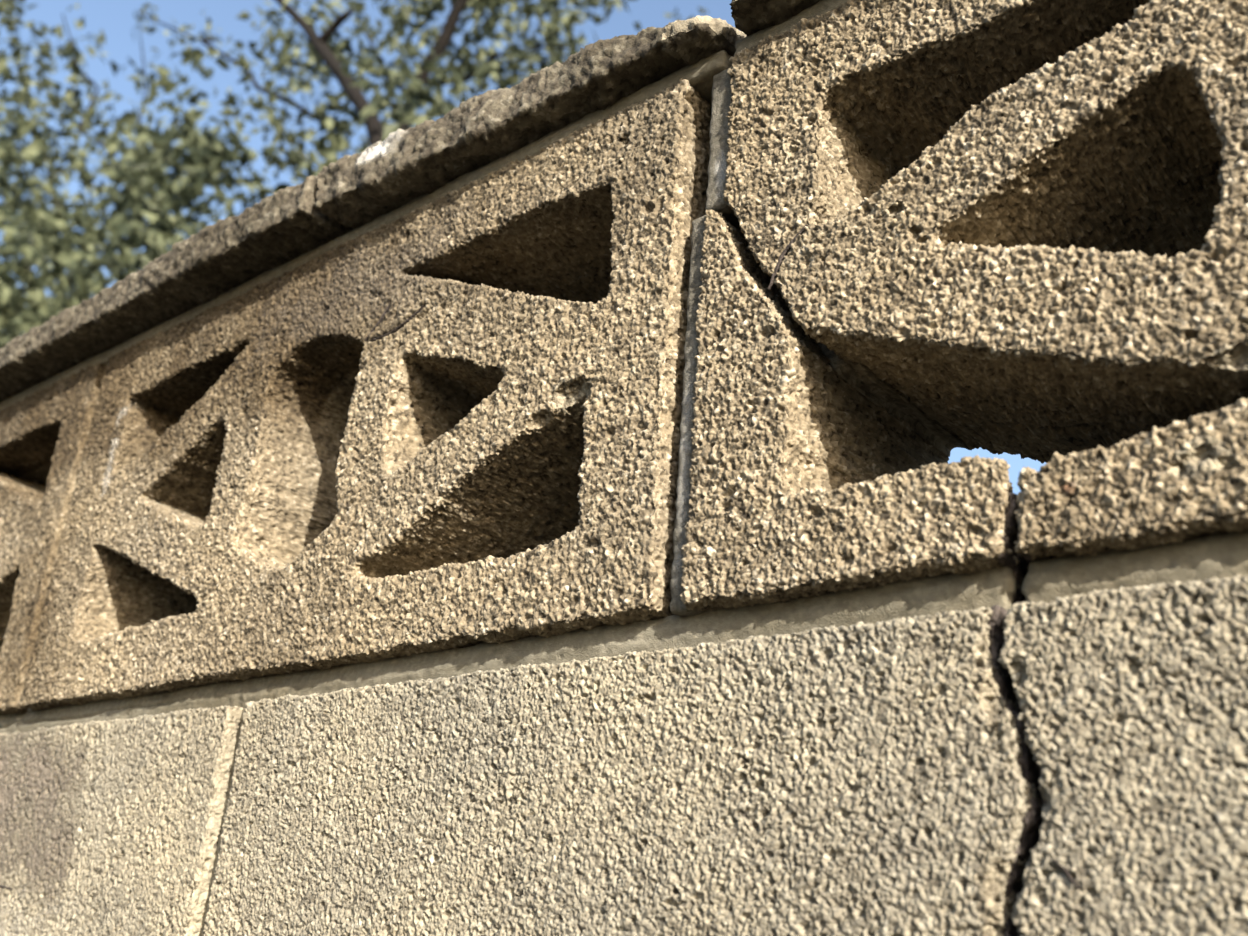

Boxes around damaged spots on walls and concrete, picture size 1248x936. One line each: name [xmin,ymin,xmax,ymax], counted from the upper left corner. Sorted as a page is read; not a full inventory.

crack [768,224,808,305]
crack [816,340,972,457]
crack [988,492,1047,936]